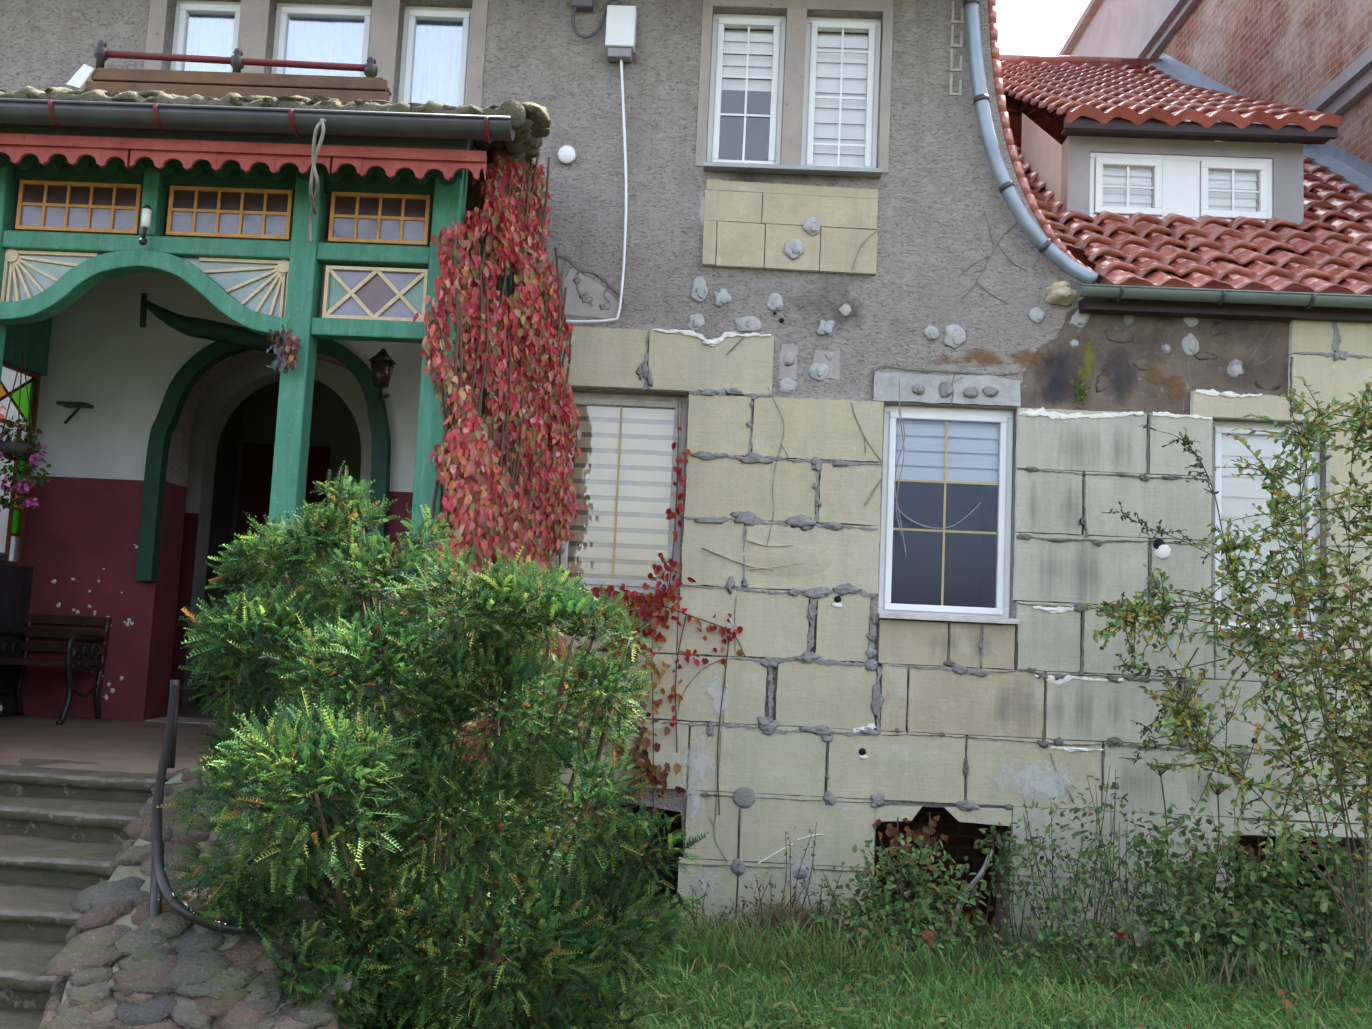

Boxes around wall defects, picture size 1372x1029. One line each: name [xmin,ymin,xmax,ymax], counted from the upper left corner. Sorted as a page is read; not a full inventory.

crack [959,211,1028,303]
spalling [636,329,771,390]
flaking render [1016,307,1372,614]
spalling [662,388,1204,803]
spalling [1219,750,1296,804]
spalling [680,792,790,868]